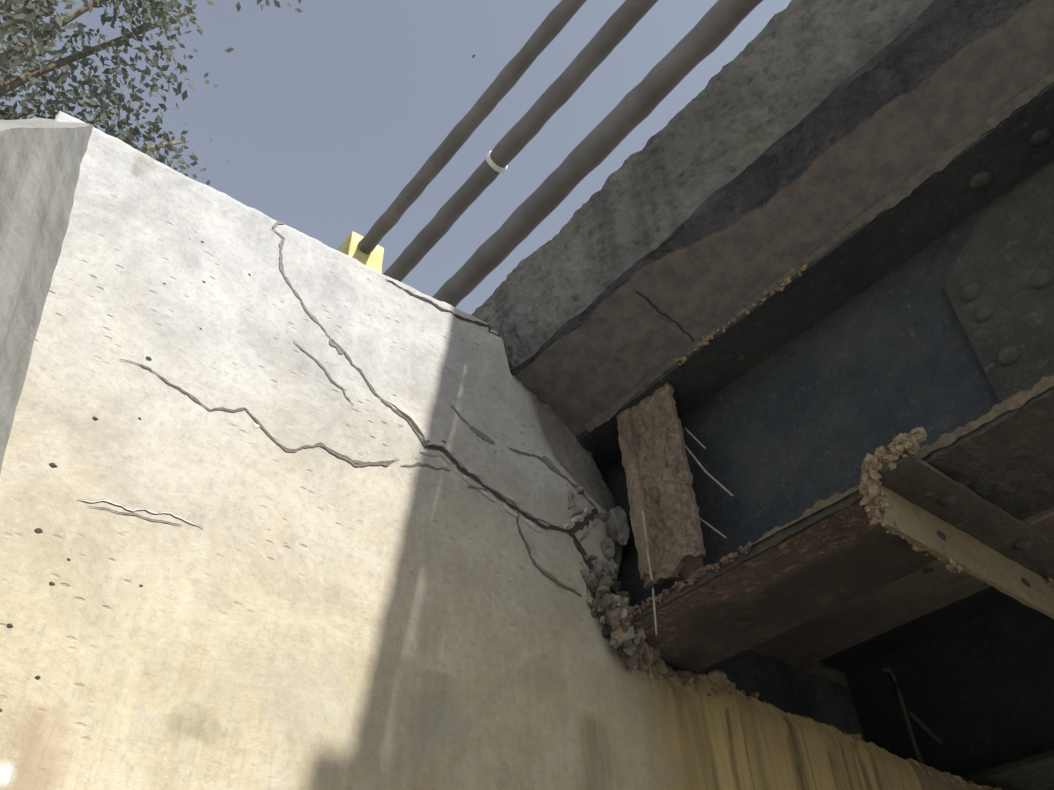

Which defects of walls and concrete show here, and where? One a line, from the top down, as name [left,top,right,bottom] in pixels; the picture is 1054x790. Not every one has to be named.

crack [635,291,694,342]
crack [121,221,598,597]
crack [79,498,203,528]
spalling [580,537,760,702]
leakage [662,675,1002,790]